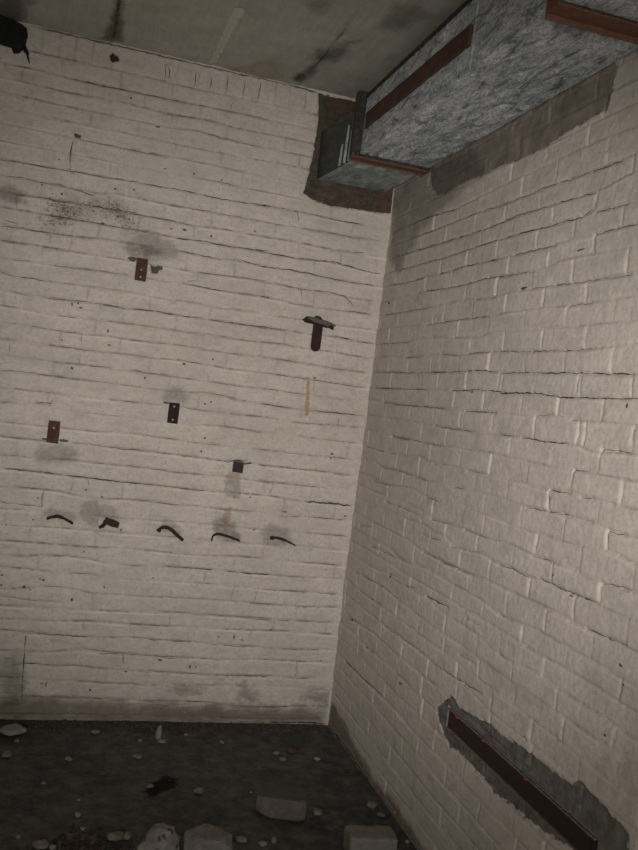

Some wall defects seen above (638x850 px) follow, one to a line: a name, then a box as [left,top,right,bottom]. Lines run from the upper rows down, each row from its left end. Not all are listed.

flaking render [303,93,394,213]
spalling [437,695,629,850]